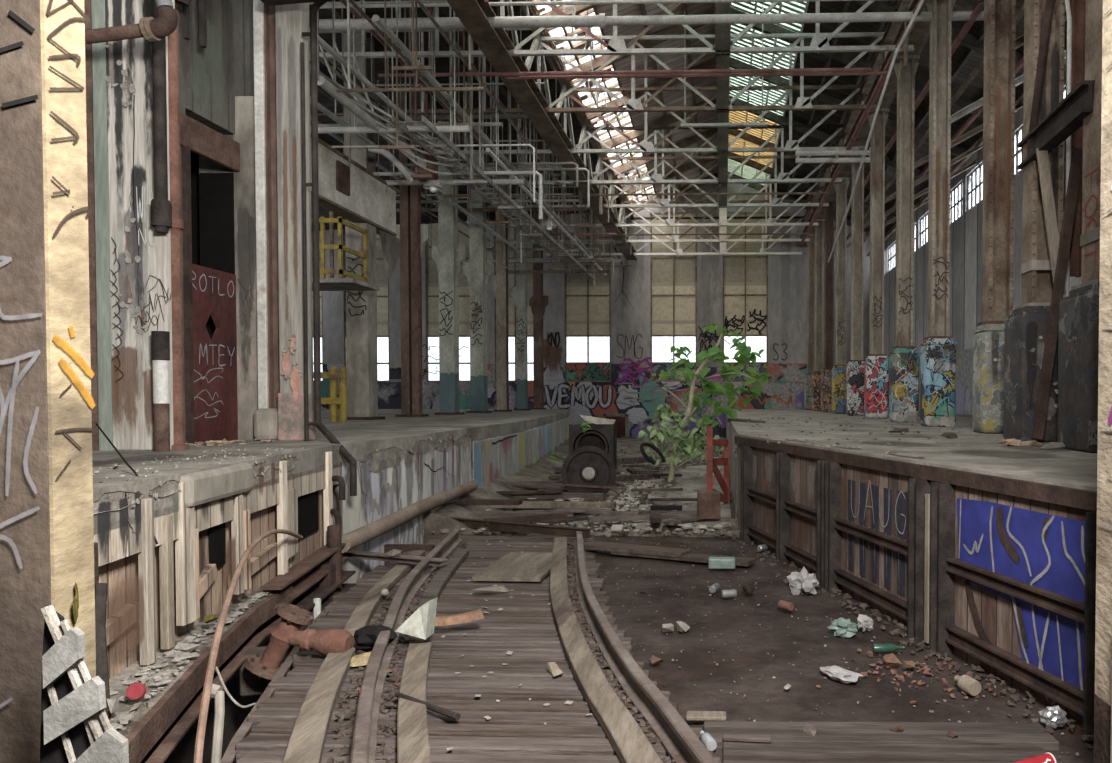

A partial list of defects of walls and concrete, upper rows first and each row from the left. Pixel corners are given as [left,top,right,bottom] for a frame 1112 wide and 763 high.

water stain [105,0,152,27]
water stain [106,37,153,315]
water stain [98,491,141,556]